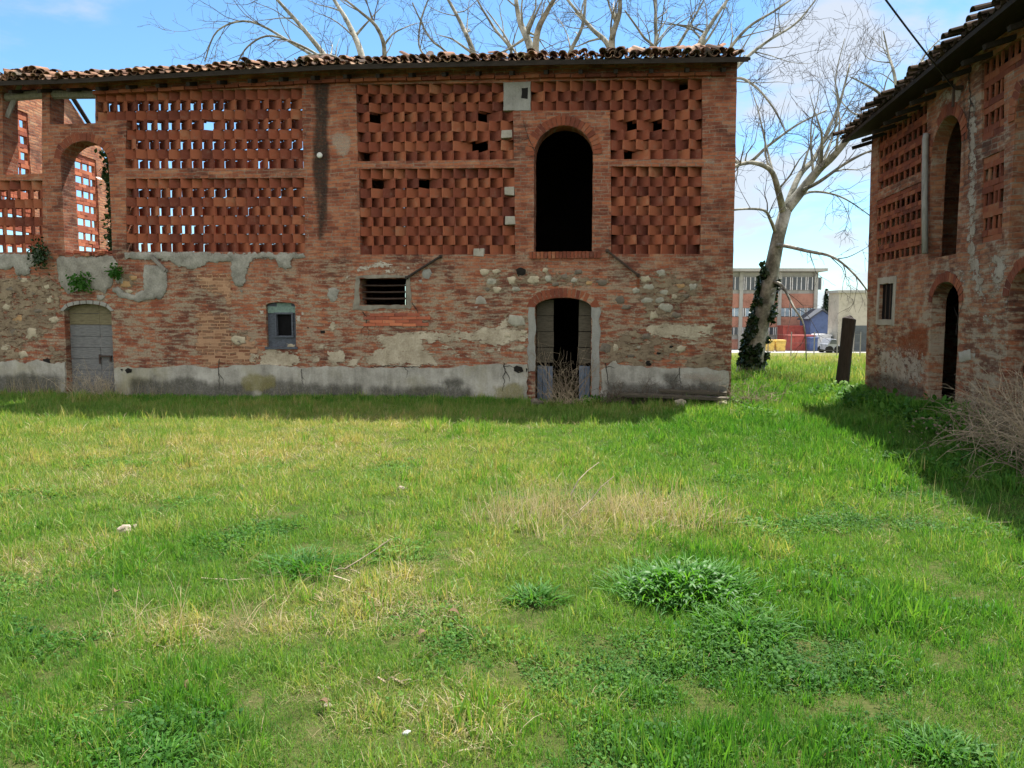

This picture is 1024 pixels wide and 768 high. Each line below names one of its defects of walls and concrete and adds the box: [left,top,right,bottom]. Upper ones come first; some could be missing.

leakage [313,83,328,237]
peeling [0,251,306,321]